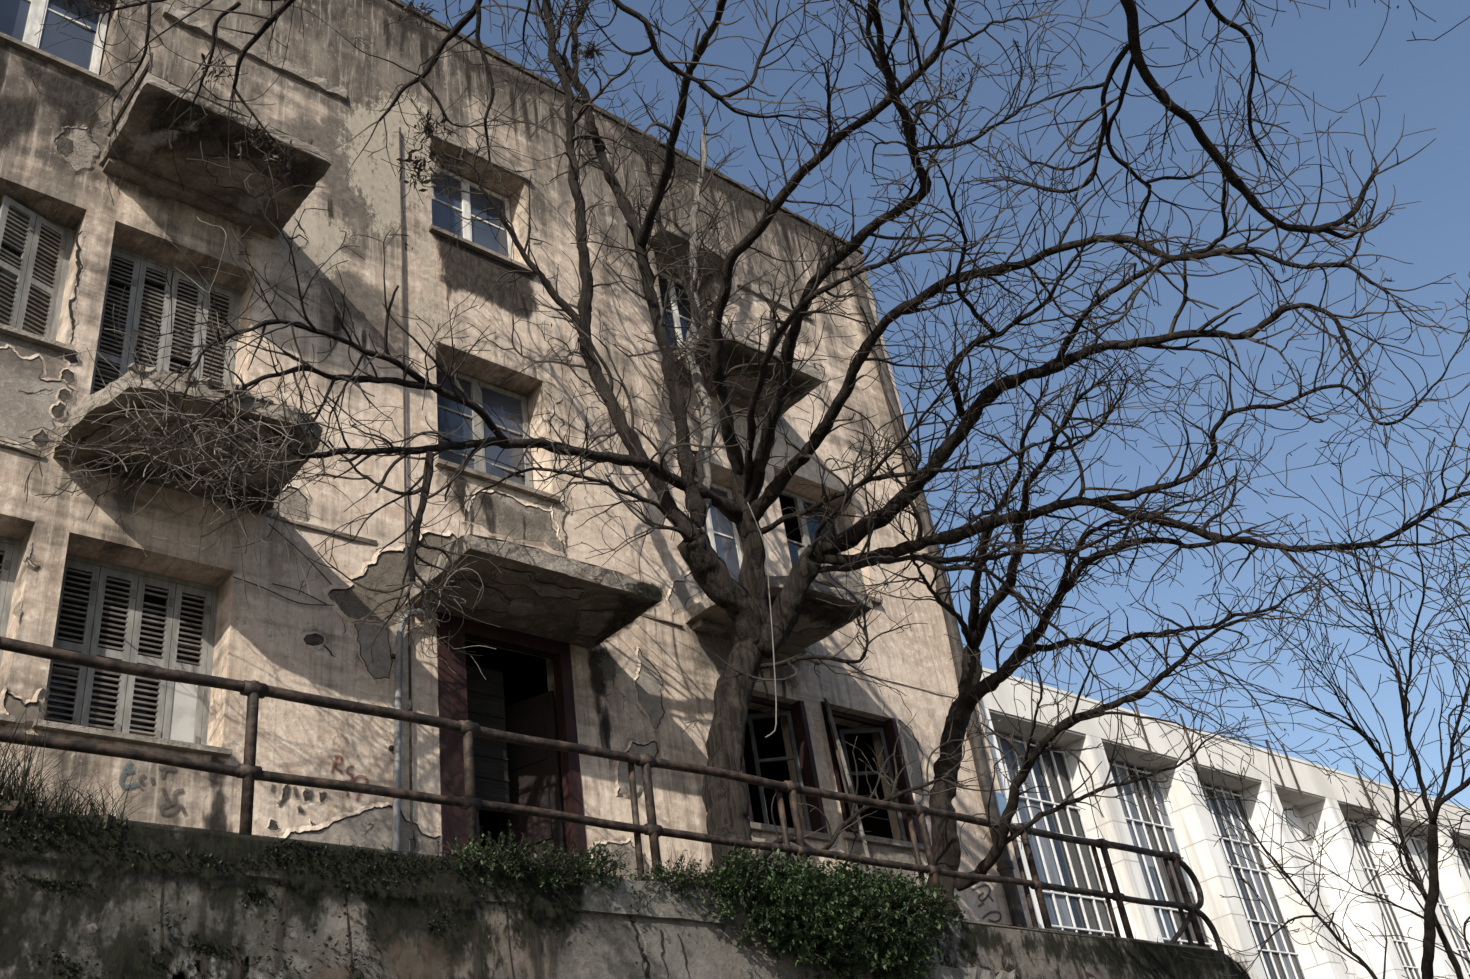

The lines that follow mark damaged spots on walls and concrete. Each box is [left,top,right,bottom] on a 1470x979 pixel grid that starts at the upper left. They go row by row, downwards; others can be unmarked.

damp [0,44,99,148]
damp [365,0,841,280]
damp [114,92,537,364]
flaking render [0,344,81,453]
flaking render [323,467,573,681]
flaking render [614,647,666,800]
flaking render [253,784,442,856]
damp [526,923,557,979]
crack [628,915,690,979]